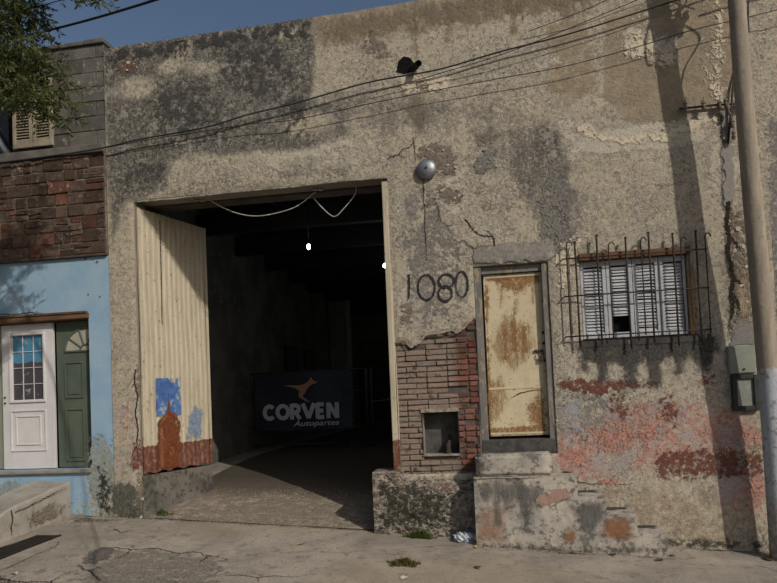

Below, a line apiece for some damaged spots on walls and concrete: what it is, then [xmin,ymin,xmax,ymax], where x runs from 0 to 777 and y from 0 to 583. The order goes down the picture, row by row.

spalling [569,0,731,146]
crack [423,181,495,260]
rust [484,273,540,322]
crack [725,201,744,335]
rust [157,396,181,470]
flaking render [395,318,481,473]
rust [486,308,547,436]
damp [576,333,719,388]
spalling [555,376,766,507]
crack [11,489,65,537]
damp [482,482,542,532]
damp [578,504,602,530]